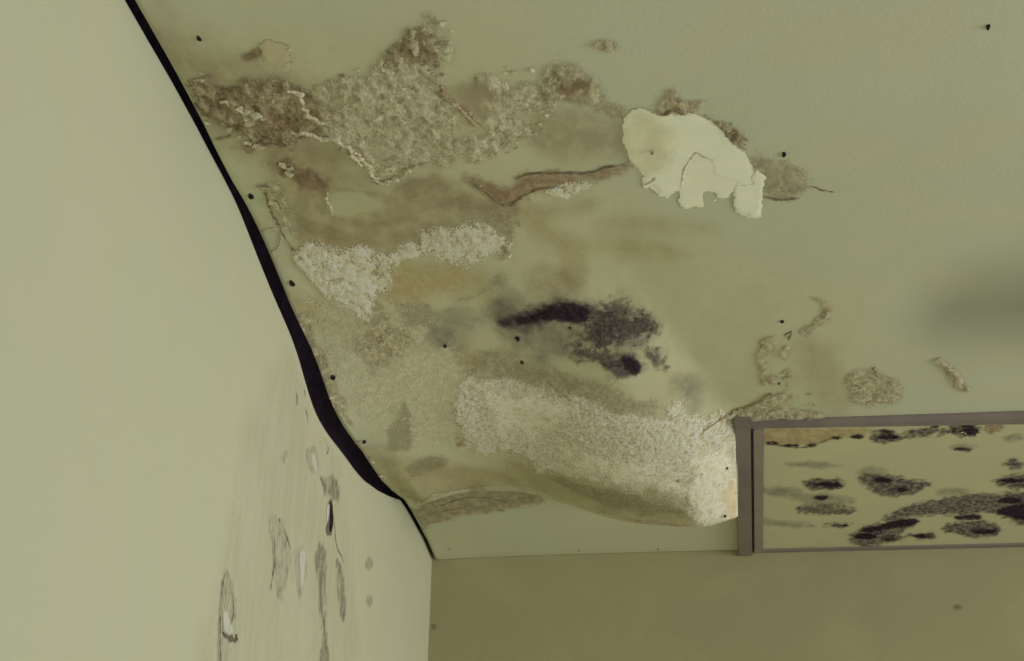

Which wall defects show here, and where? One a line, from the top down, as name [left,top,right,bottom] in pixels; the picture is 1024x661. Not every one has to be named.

spalling [181,11,603,262]
peeling [622,86,800,218]
leakage [275,154,738,529]
spalling [843,367,905,410]
leakage [765,425,1019,452]
leakage [766,459,1024,547]